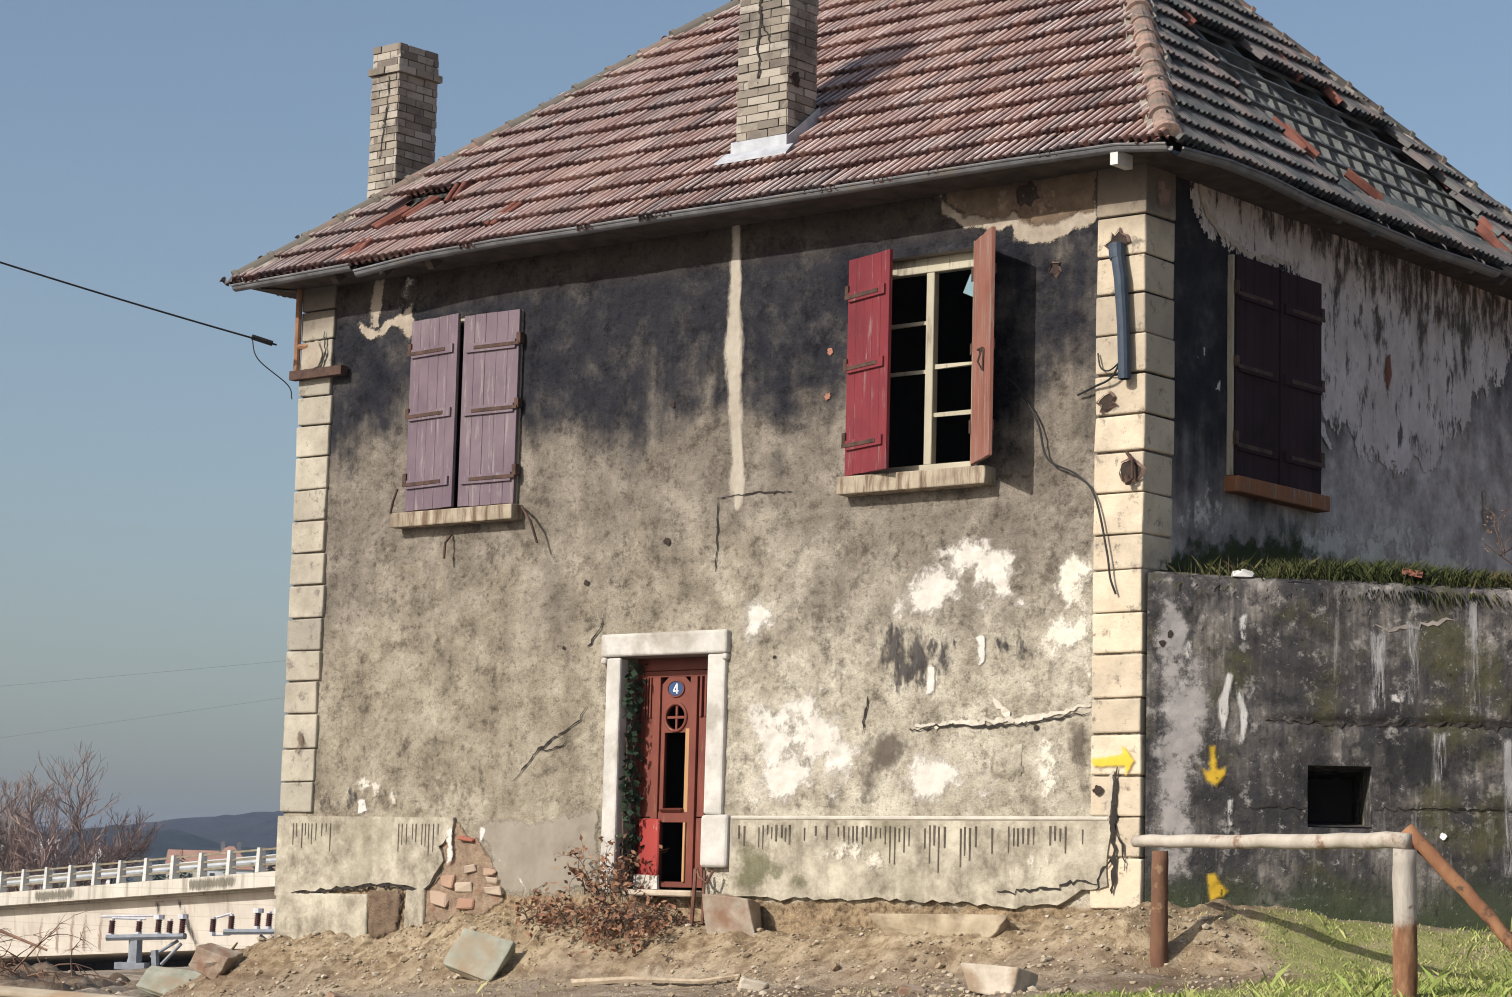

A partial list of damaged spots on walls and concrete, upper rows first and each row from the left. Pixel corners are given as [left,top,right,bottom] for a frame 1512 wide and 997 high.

spalling [939,168,1098,244]
spalling [1104,227,1130,248]
peeling [359,278,414,340]
leakage [724,225,746,511]
peeling [1190,183,1512,479]
leakage [893,538,1024,618]
leakage [1371,633,1413,706]
crack [861,696,869,733]
crack [910,697,1091,731]
leakage [1152,592,1248,879]
leakage [1504,741,1512,872]
spalling [425,822,505,922]